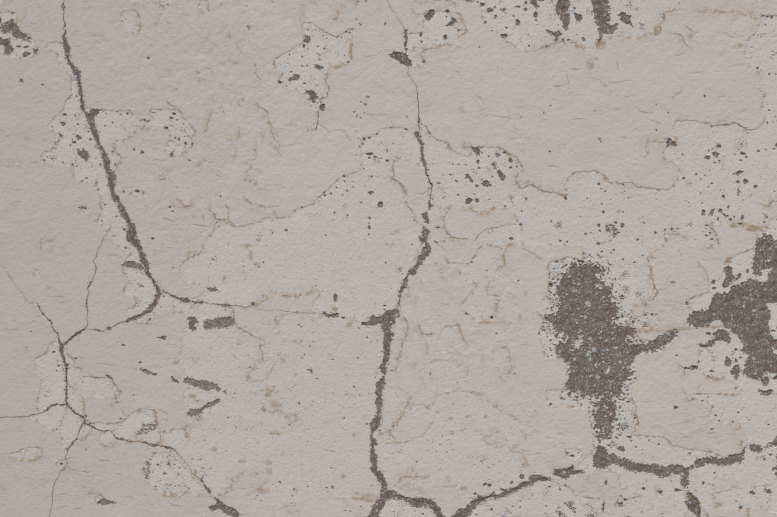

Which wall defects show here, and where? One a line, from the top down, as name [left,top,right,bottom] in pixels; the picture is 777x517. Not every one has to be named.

peeling [0,0,38,59]
peeling [255,2,356,117]
crack [365,0,408,57]
peeling [388,0,468,67]
peeling [466,0,680,53]
crack [0,1,311,517]
peeling [29,41,424,517]
crack [346,74,640,517]
peeling [417,15,777,517]
peeling [374,382,530,503]